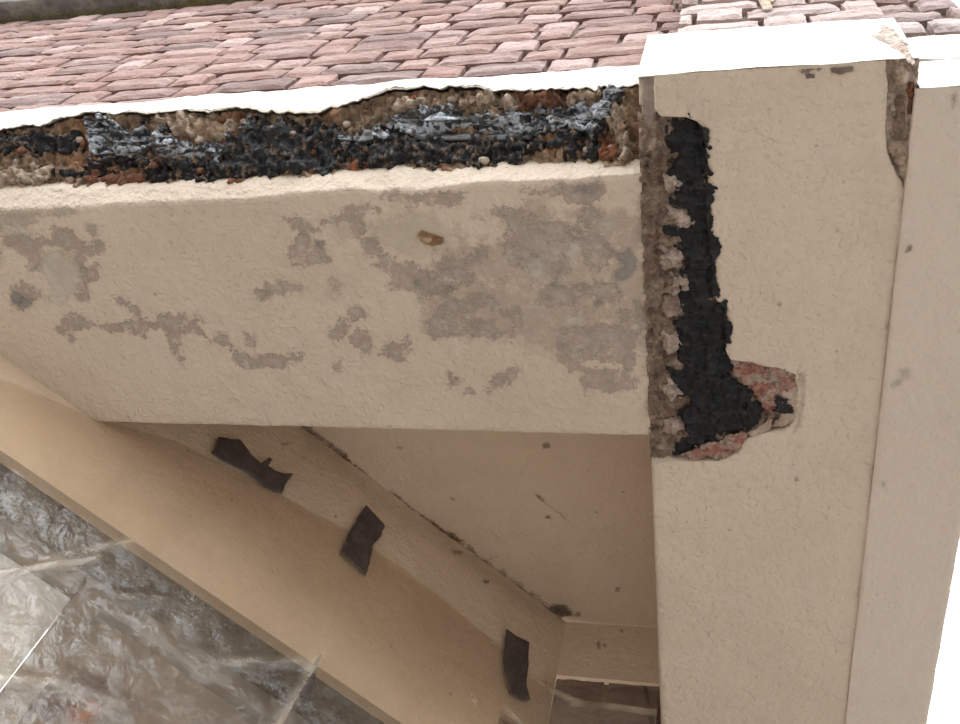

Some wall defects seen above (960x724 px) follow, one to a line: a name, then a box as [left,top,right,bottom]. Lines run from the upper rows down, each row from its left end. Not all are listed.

spalling [871,24,920,183]
spalling [0,76,804,461]
leakage [376,218,438,247]
leakage [614,249,637,280]